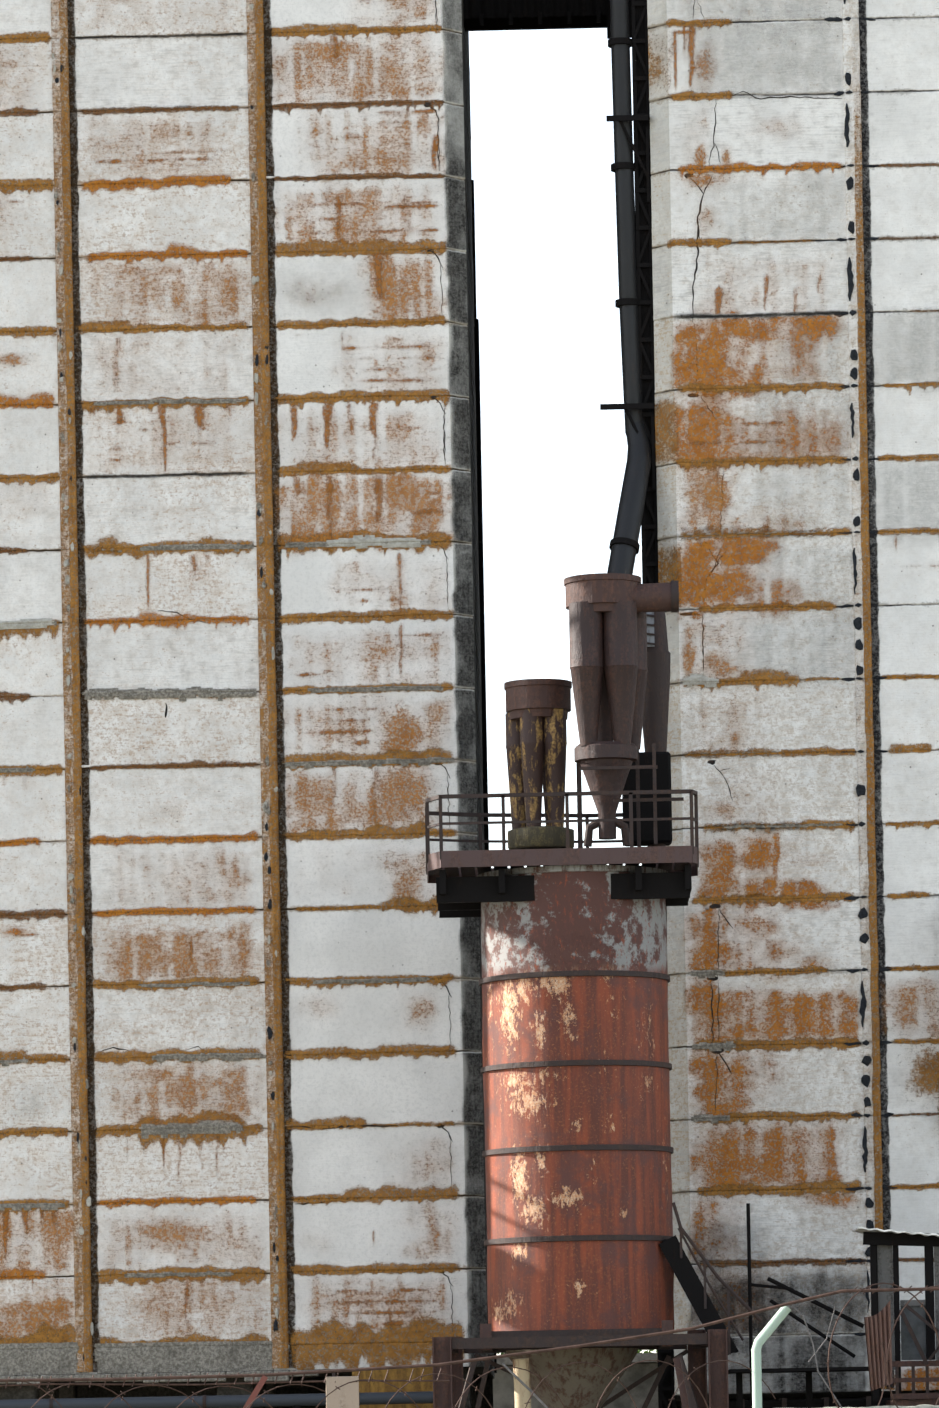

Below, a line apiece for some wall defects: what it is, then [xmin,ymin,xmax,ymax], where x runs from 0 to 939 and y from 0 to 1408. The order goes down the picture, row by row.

rust [0,0,464,1372]
rust [881,1366,939,1391]